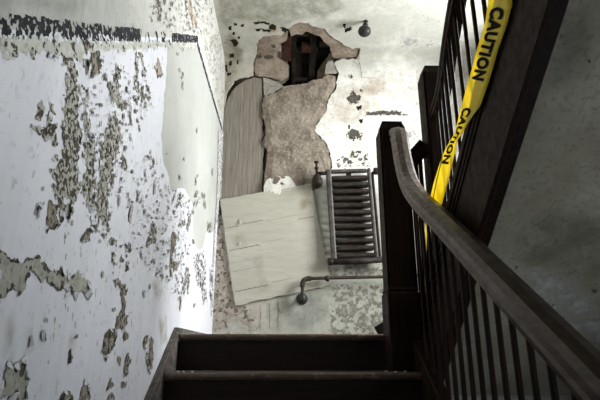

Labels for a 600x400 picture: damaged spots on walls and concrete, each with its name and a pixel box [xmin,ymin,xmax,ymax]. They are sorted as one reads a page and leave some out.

peeling [0,0,371,400]
peeling [329,264,383,334]